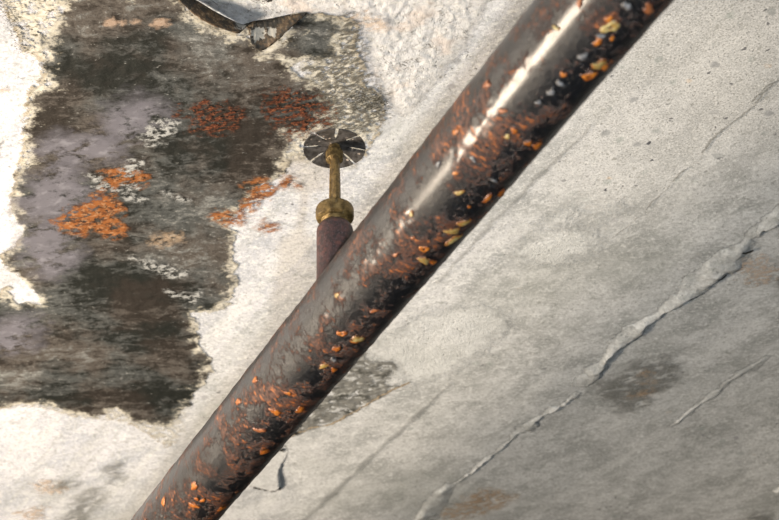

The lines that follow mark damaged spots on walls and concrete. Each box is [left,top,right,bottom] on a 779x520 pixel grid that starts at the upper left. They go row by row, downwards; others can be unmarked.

mould [0,0,30,53]
mould [299,13,391,136]
rust [189,99,246,137]
rust [260,86,338,141]
rust [53,168,150,240]
leakage [16,101,188,279]
peeling [0,0,491,448]
rust [208,175,302,227]
leakage [0,316,36,353]